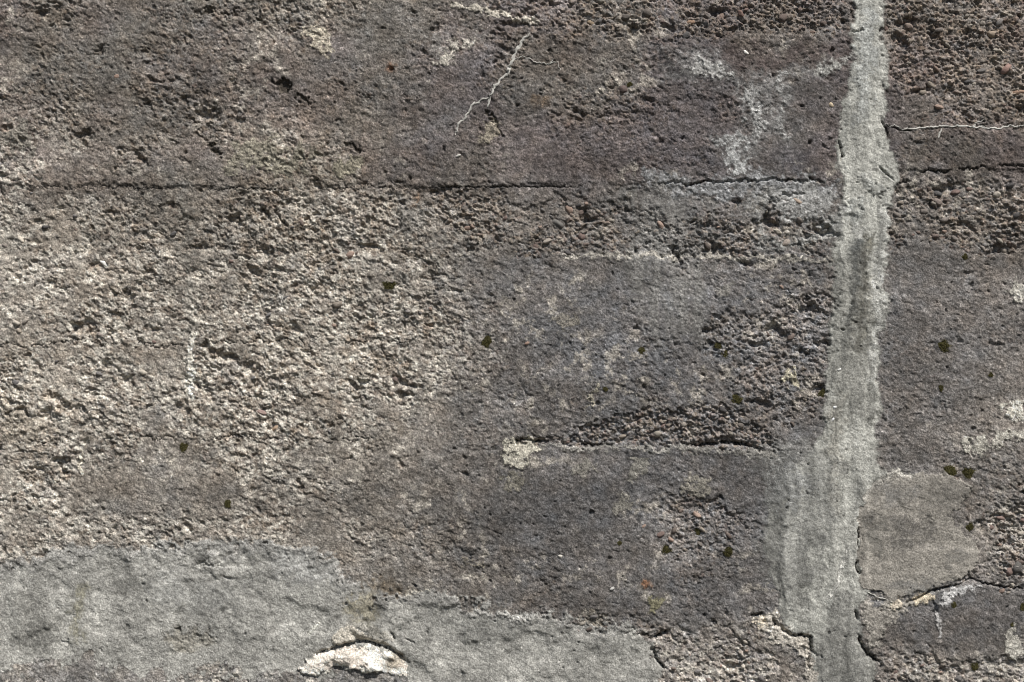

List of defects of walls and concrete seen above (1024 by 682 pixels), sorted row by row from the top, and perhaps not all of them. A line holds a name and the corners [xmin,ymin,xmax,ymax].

crack [455,33,561,135]
crack [881,119,1024,138]
crack [35,183,586,193]
damp [560,4,890,383]
crack [881,164,1024,186]
crack [686,440,763,451]
damp [862,467,914,502]
crack [855,536,1023,662]
flaking render [297,620,408,676]